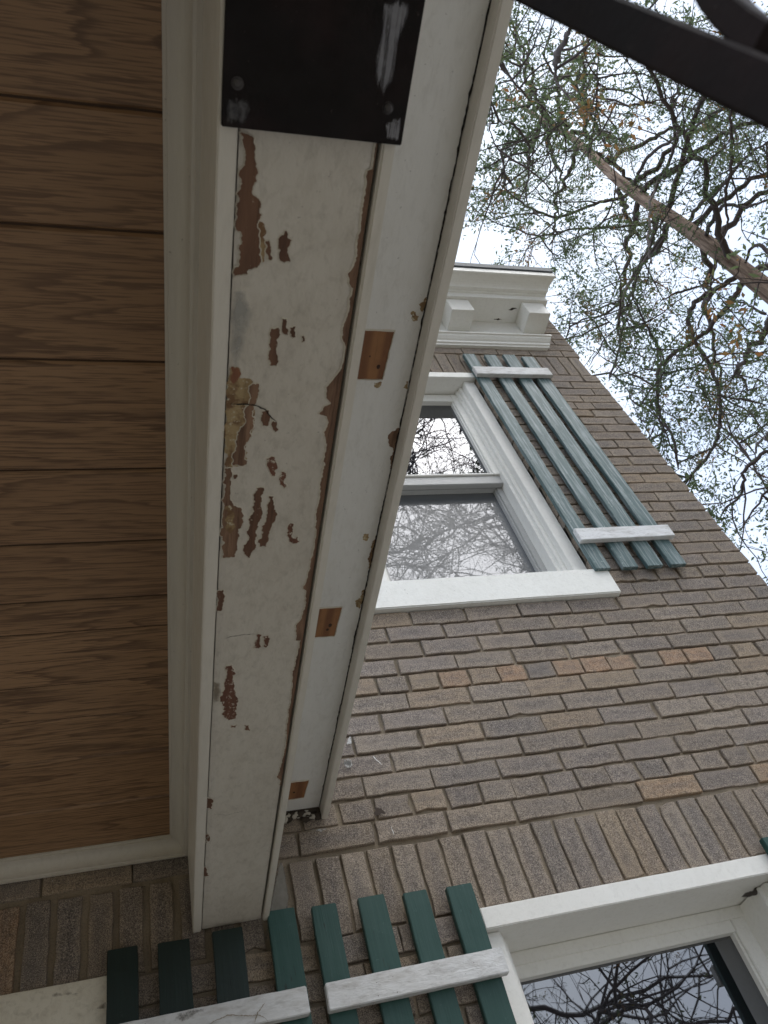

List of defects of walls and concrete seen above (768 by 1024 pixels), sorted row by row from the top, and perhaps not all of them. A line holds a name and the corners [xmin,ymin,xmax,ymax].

peeling [232,130,293,278]
peeling [267,317,306,367]
peeling [357,329,396,388]
peeling [219,367,300,559]
peeling [276,143,377,824]
peeling [387,427,399,470]
peeling [219,664,251,731]